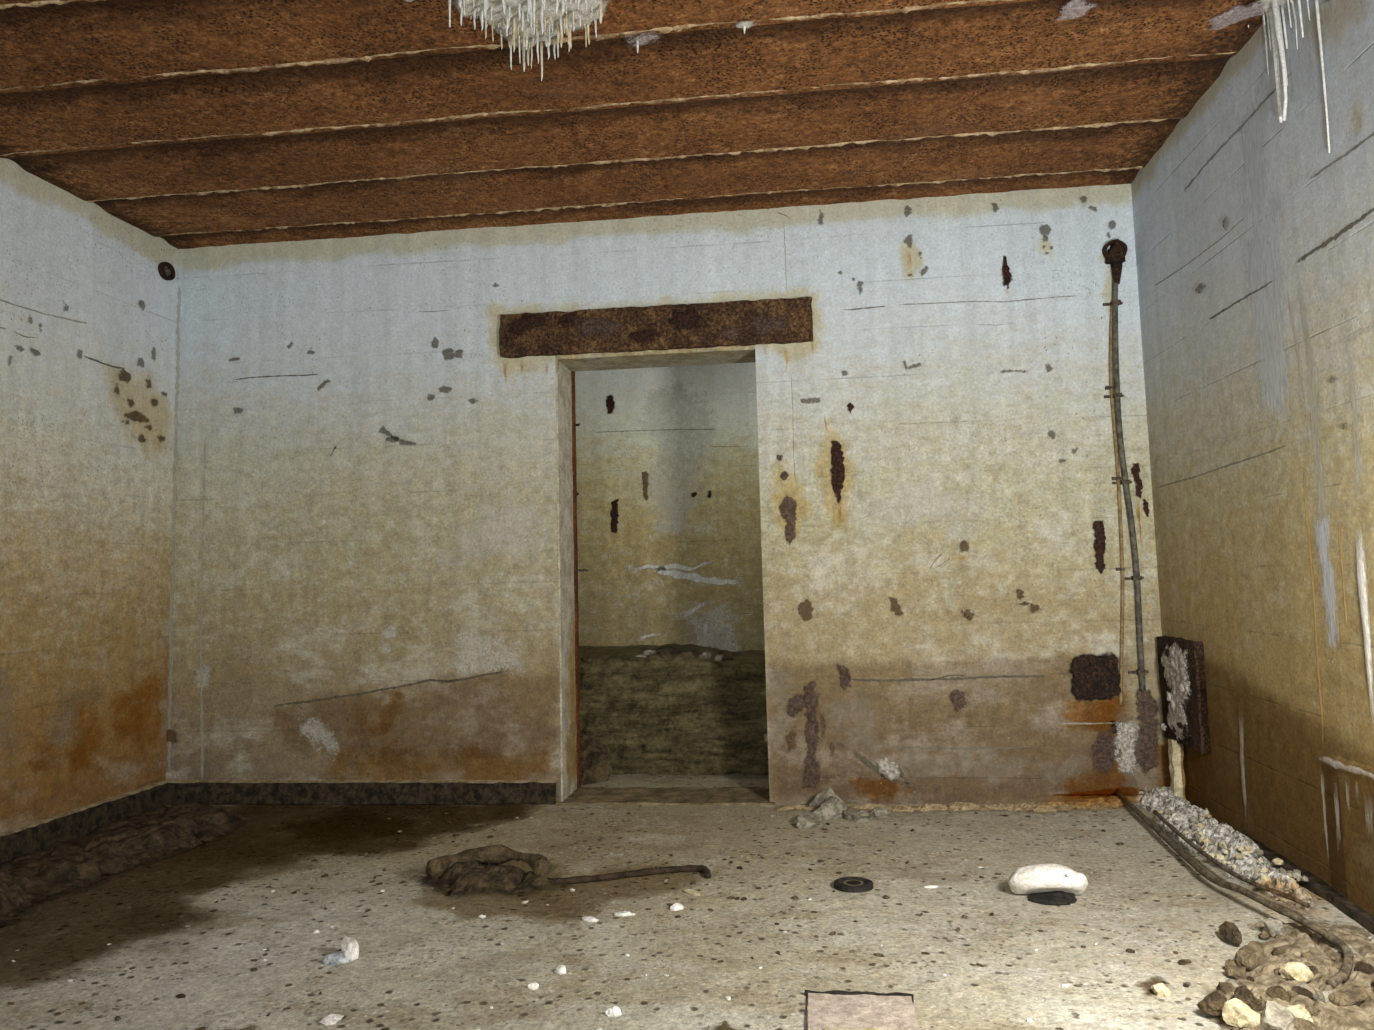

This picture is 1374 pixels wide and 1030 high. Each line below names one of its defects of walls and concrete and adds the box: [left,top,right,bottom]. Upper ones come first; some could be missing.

corrosion [785,681,834,788]
corrosion [1090,690,1159,774]